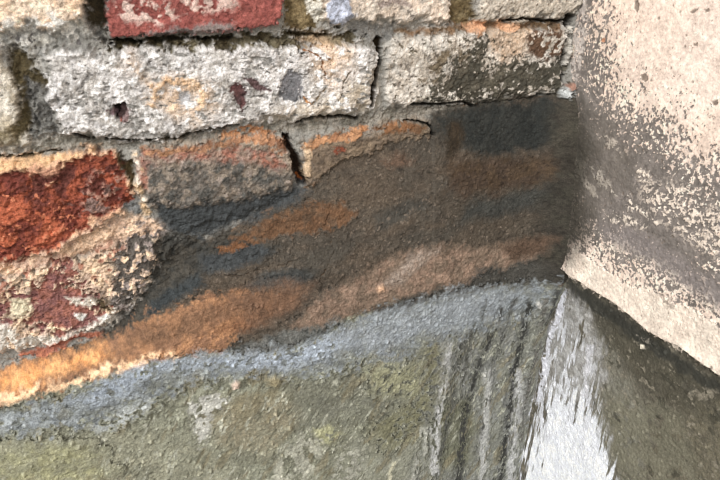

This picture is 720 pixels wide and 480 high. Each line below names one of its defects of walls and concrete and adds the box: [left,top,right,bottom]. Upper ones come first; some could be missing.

crack [0,123,244,160]
crack [107,31,235,47]
crack [281,29,383,184]
spalling [0,144,291,358]
water stain [95,153,358,335]
water stain [408,22,720,480]
water stain [0,263,565,480]